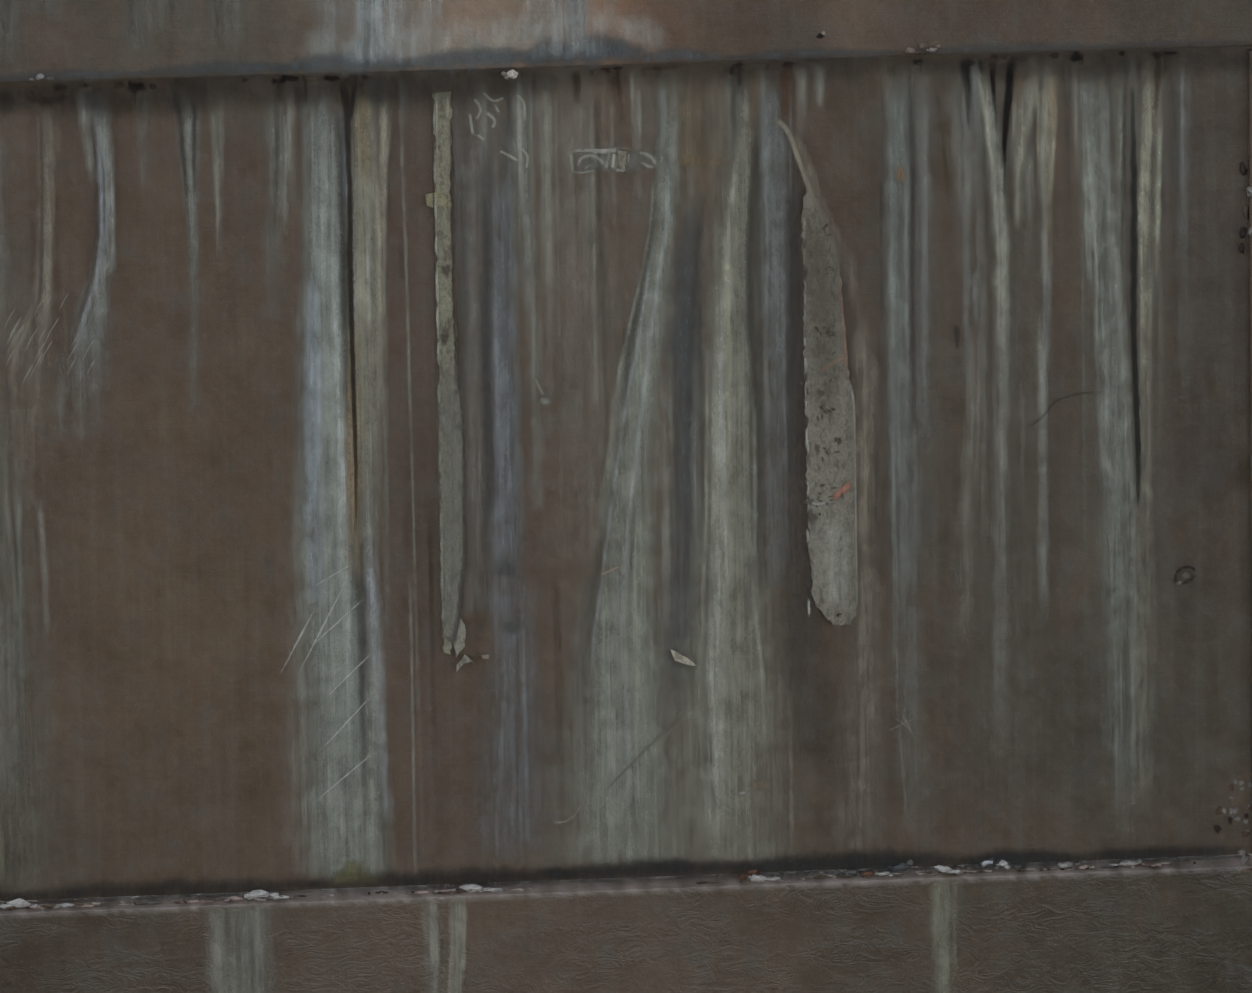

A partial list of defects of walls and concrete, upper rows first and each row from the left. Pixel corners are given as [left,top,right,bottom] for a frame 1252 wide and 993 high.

water stain [151,0,714,74]
peeling [469,92,526,140]
peeling [501,69,518,80]
water stain [38,150,52,319]
water stain [81,113,113,341]
crack [1131,61,1160,499]
peeling [425,91,489,671]
peeling [777,120,858,625]
water stain [304,87,1226,889]
water stain [104,881,295,897]
water stain [430,904,438,983]
water stain [934,883,950,993]